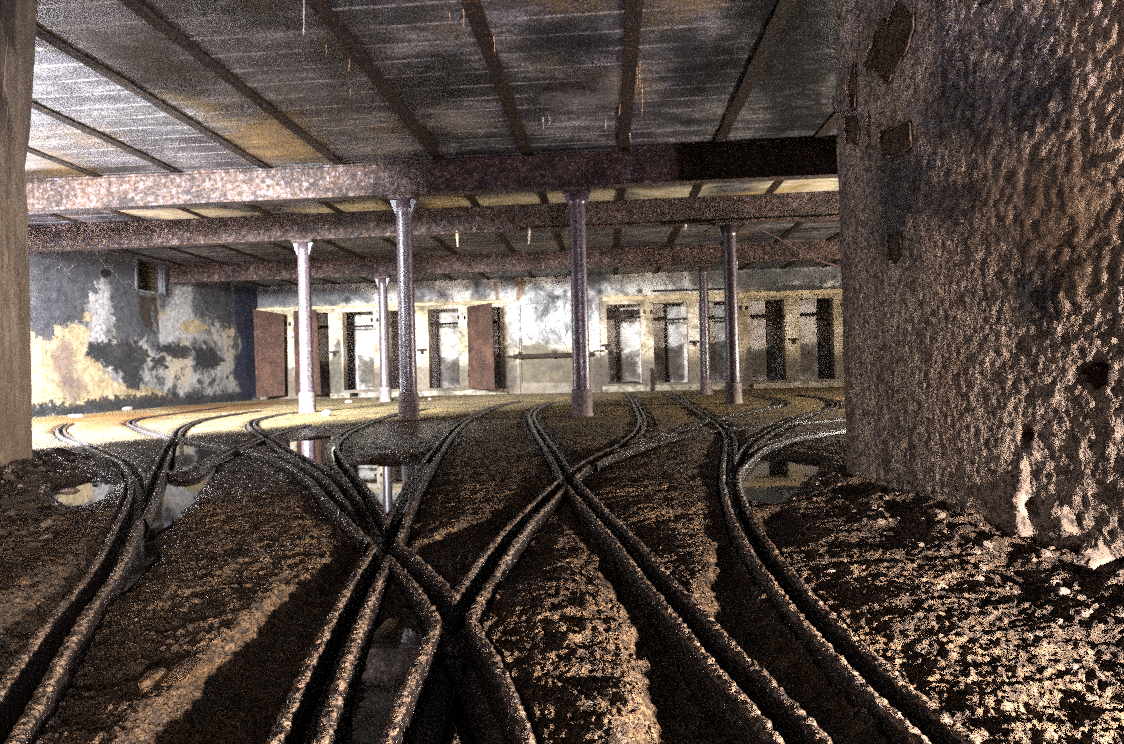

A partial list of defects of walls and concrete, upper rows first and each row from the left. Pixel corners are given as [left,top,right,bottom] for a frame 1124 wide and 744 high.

spalling [843,2,915,160]
corrosion [38,149,79,174]
corrosion [428,197,462,208]
spalling [886,231,902,264]
peeling [154,309,209,335]
peeling [31,302,178,409]